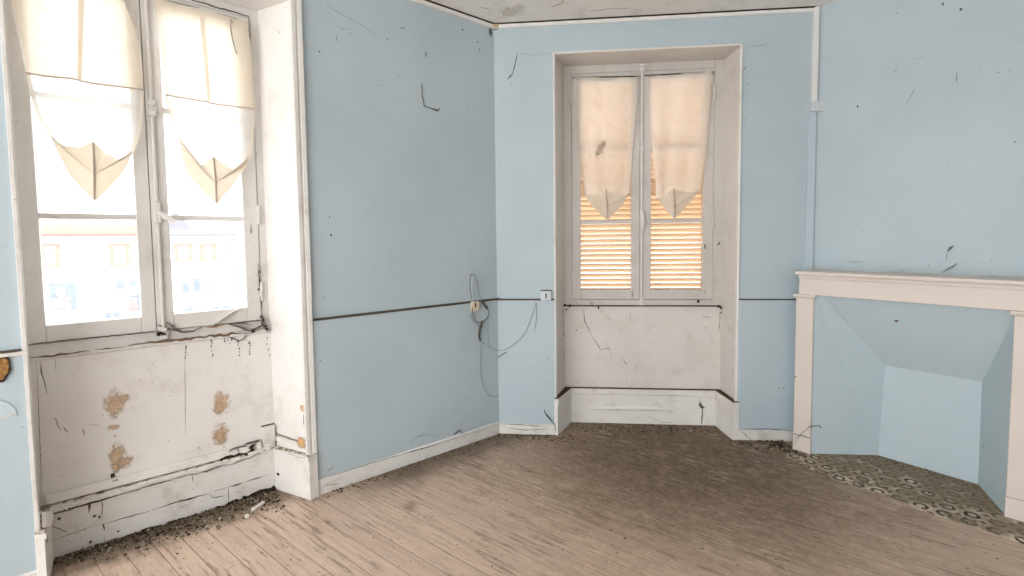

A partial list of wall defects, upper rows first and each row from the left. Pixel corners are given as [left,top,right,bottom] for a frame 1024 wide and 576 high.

spalling [0,357,11,382]
peeling [42,446,271,528]
crack [47,414,541,543]